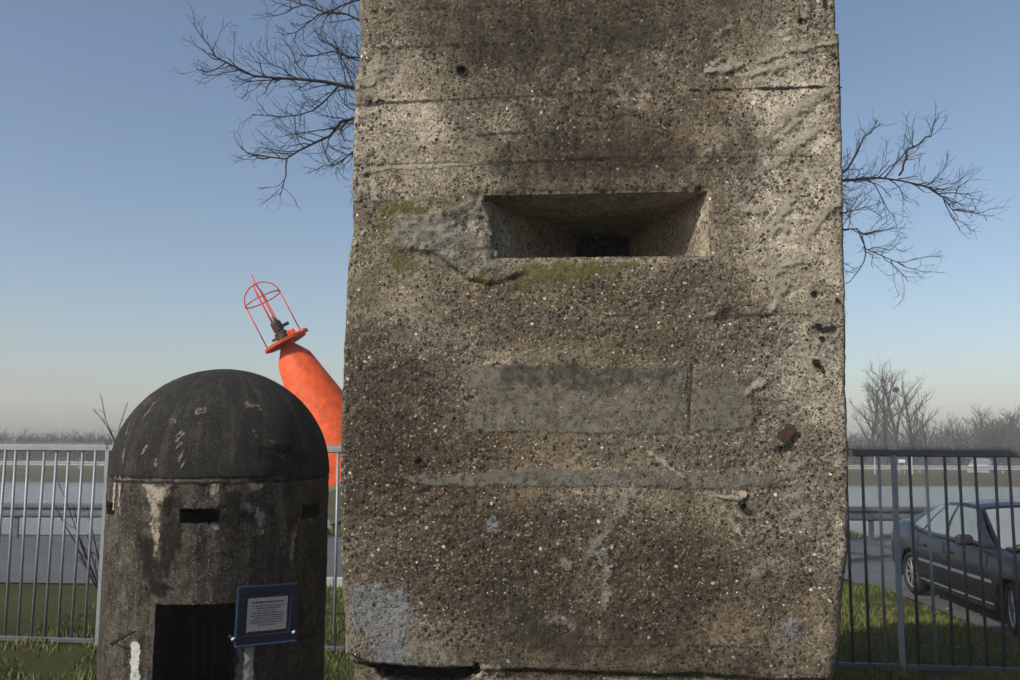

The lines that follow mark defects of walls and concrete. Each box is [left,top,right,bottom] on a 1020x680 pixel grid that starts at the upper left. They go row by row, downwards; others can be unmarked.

corrosion [777,424,798,442]